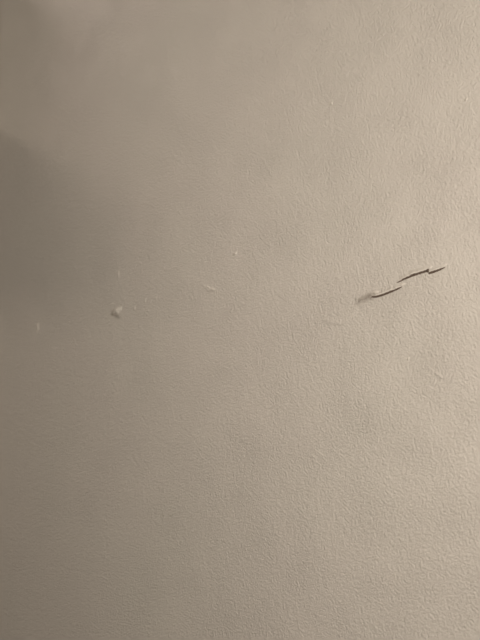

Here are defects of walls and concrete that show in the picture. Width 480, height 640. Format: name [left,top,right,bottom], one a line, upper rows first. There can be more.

crack [356,264,448,302]